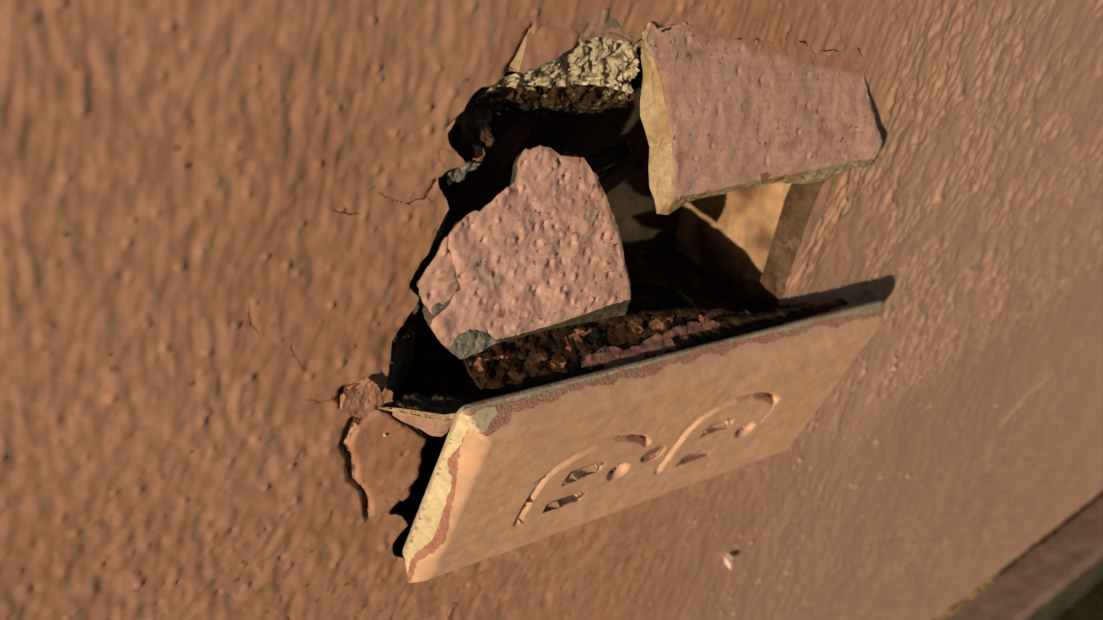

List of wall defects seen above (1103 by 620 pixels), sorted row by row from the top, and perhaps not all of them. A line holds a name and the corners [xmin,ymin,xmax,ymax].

flaking render [486,8,644,94]
crack [372,118,457,205]
peeling [465,144,486,164]
flaking render [434,208,450,242]
flaking render [387,276,421,394]
corrosion [469,355,509,371]
corrosion [545,323,592,369]
peeling [580,320,724,370]
corrosion [631,313,678,335]